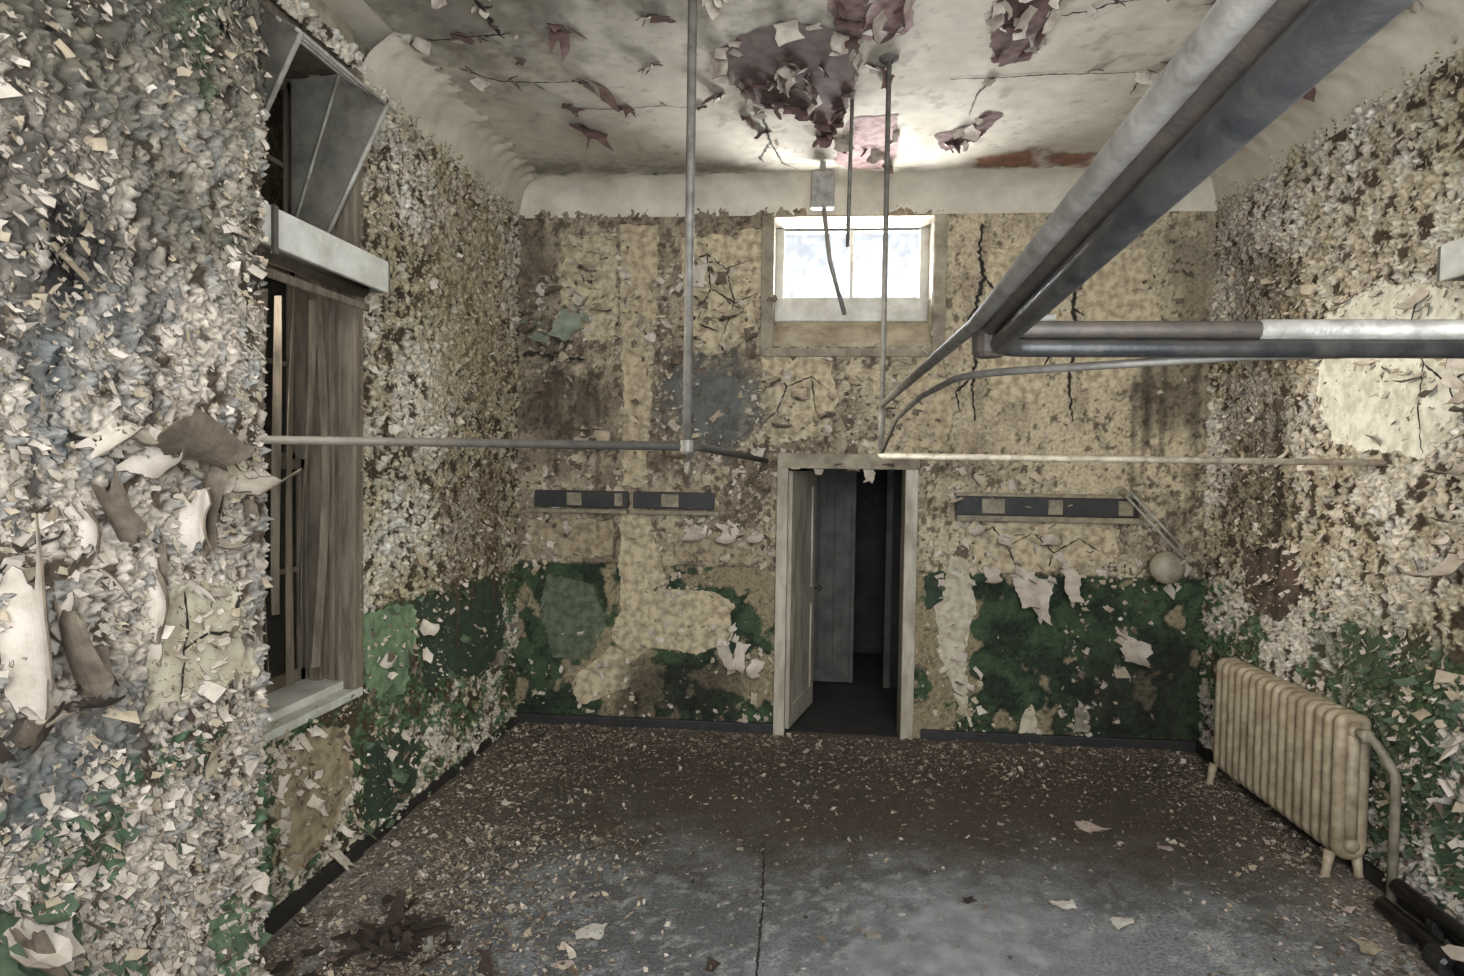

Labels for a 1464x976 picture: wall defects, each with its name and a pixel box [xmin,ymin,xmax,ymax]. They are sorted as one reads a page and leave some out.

peeling [983,0,1063,67]
crack [951,61,1169,115]
flaking render [1077,58,1464,321]
crack [967,223,994,321]
peeling [983,246,1025,300]
crack [1071,290,1085,321]
crack [955,357,978,421]
peeling [986,356,1050,445]
crack [1044,357,1075,422]
flaking render [914,463,1218,742]
flaking render [1210,358,1464,920]
crack [755,842,765,976]